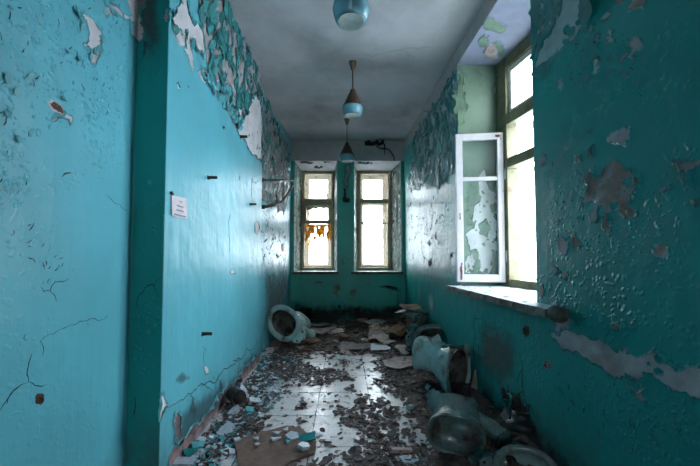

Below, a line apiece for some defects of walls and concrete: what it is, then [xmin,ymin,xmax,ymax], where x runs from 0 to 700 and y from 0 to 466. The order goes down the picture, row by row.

peeling [78,0,147,68]
peeling [477,16,508,66]
flaking render [48,99,73,126]
peeling [160,0,331,270]
peeling [391,64,470,269]
peeling [464,169,498,274]
peeling [573,143,644,238]
crack [1,316,107,409]
flaking render [158,355,259,466]
crack [164,342,257,440]
damp [295,304,403,334]
peeling [549,316,700,404]